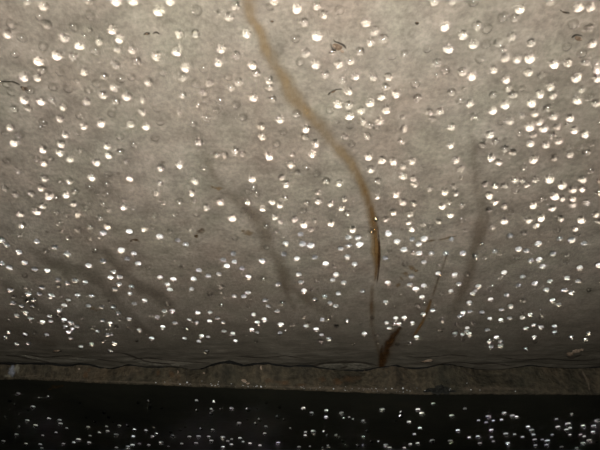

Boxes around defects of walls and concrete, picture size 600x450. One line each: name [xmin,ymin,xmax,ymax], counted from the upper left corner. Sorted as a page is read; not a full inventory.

corrosion [336,147,380,281]
corrosion [379,326,401,367]